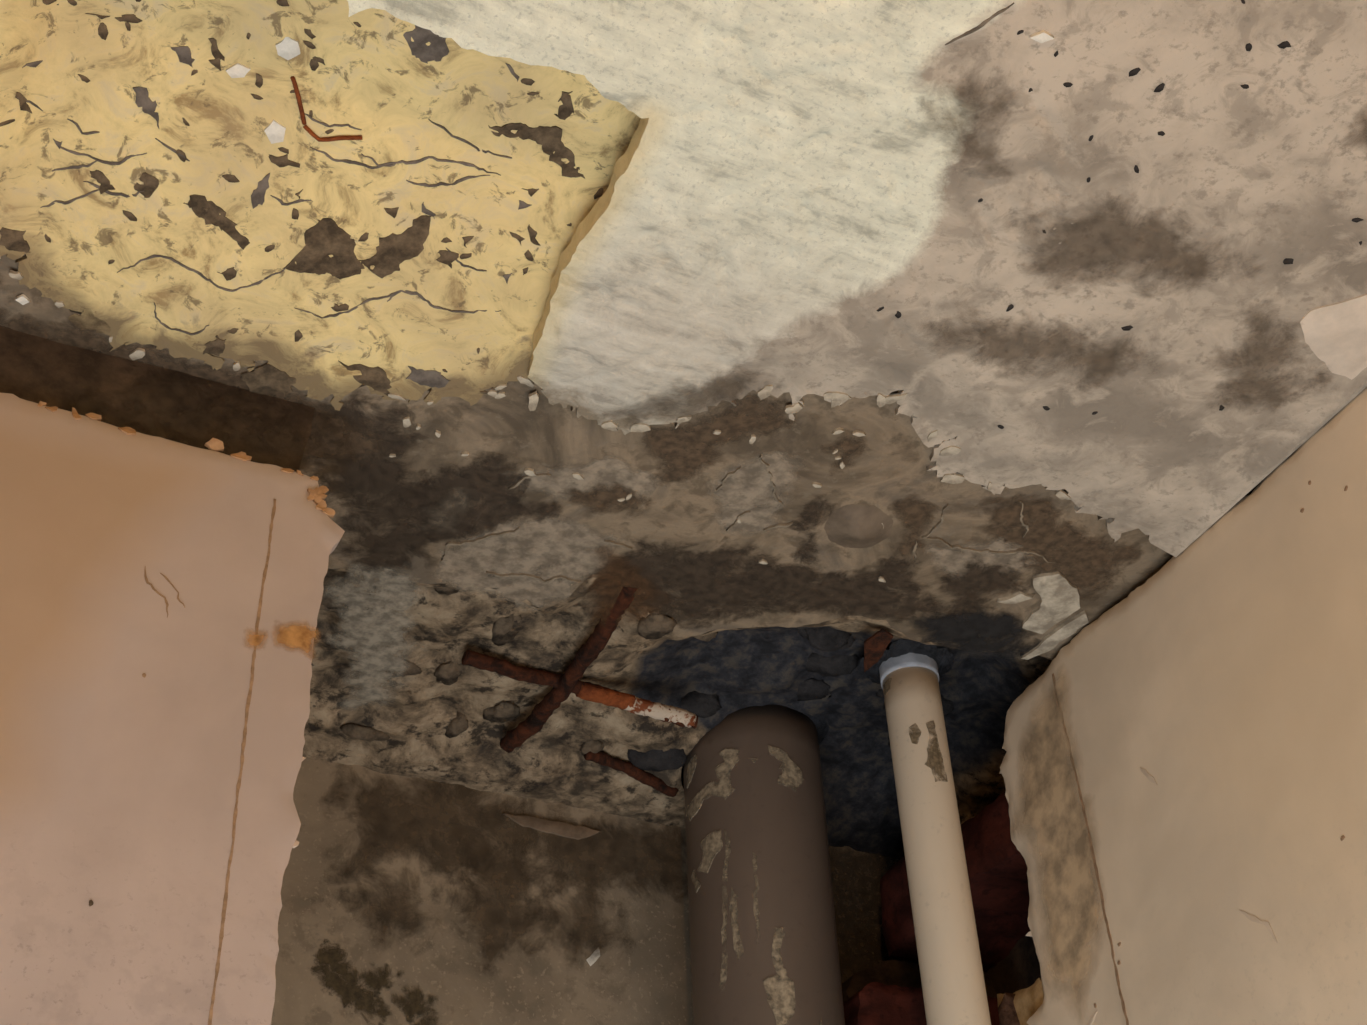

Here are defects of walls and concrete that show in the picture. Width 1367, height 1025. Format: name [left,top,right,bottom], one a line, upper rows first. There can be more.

spalling [0,0,641,411]
water stain [1036,204,1208,282]
water stain [940,325,1130,378]
water stain [1223,318,1291,403]
peeling [204,438,252,461]
peeling [601,420,651,432]
peeling [281,468,335,518]
spalling [302,567,1089,859]
water stain [325,779,688,969]
water stain [1023,682,1098,995]
crack [1052,673,1129,1025]
water stain [311,940,438,1025]